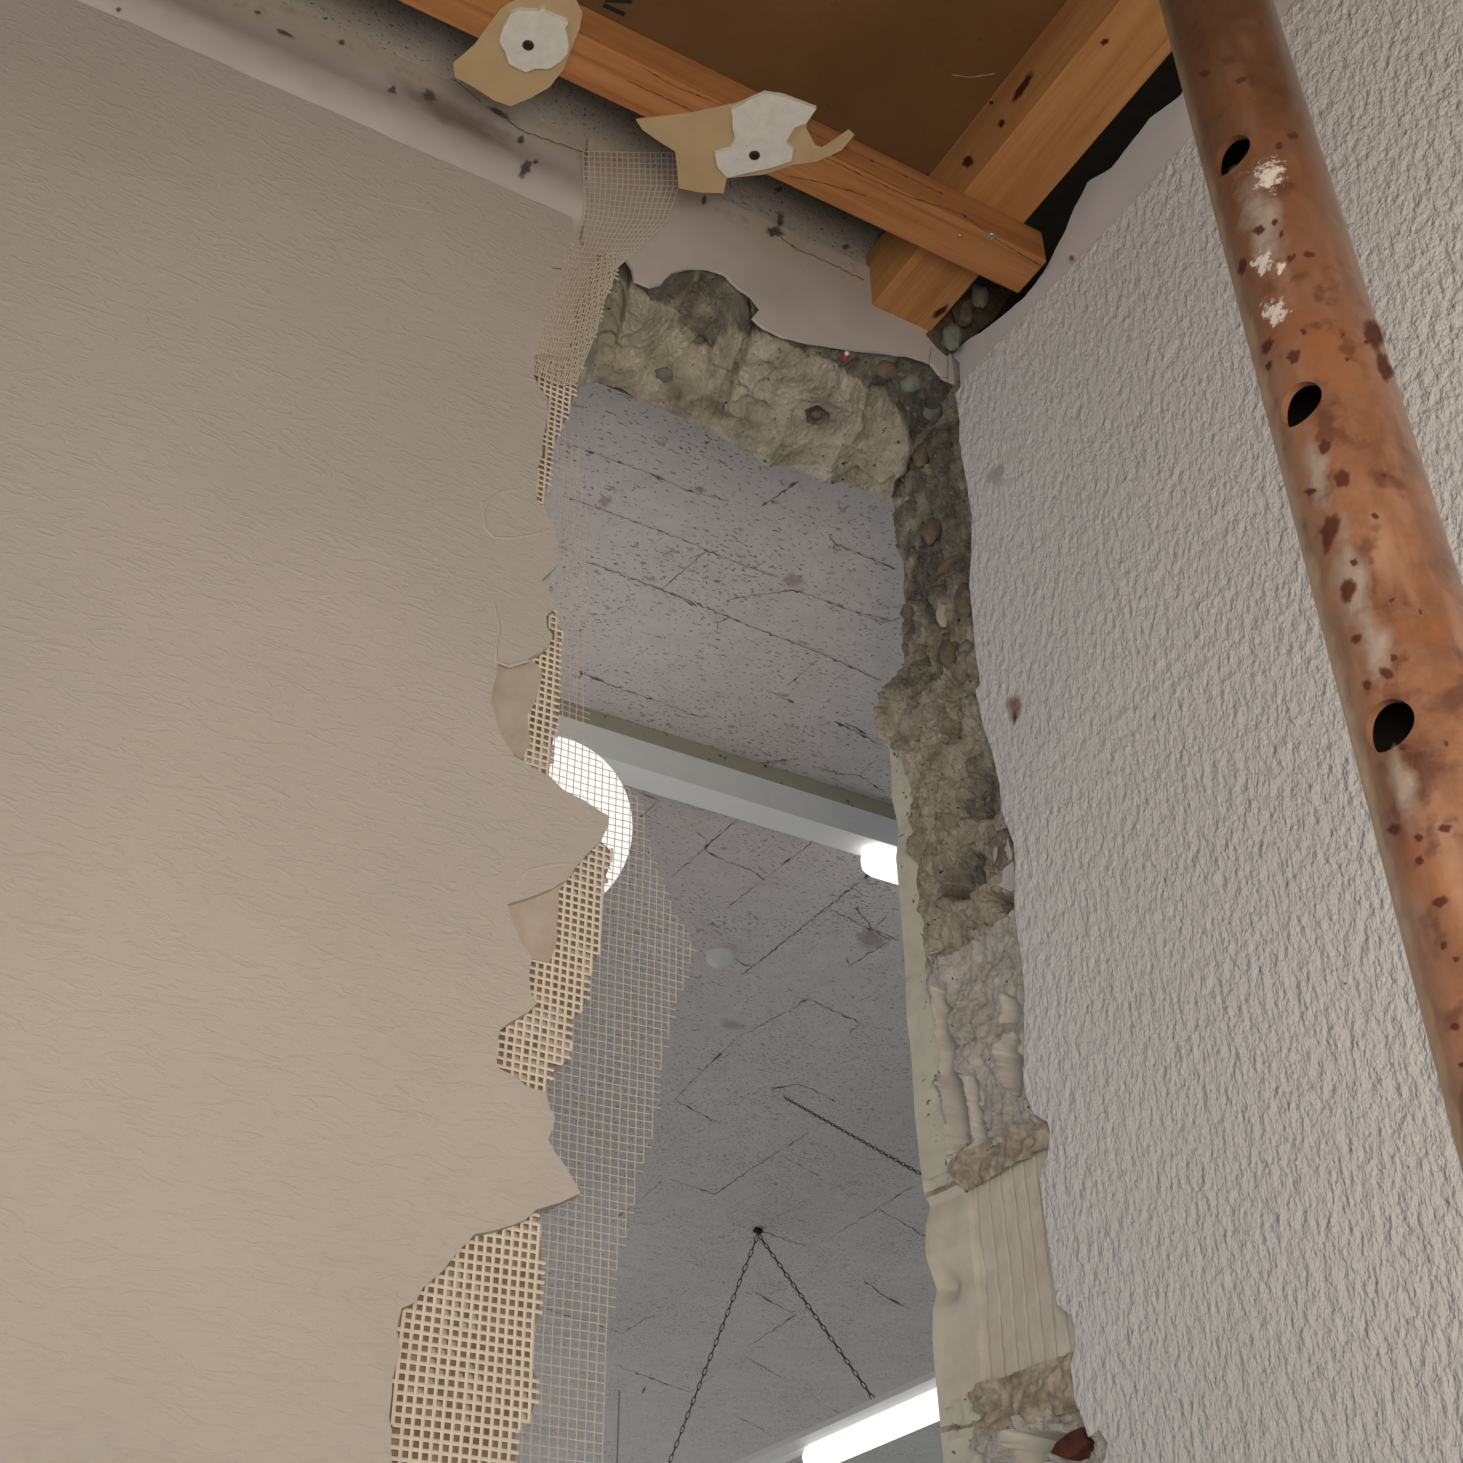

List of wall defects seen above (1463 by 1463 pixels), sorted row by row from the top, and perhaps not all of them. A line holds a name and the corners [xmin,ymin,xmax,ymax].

corrosion [1253,219,1284,237]
flaking render [532,237,620,505]
spalling [926,286,1012,356]
corrosion [1263,329,1307,370]
corrosion [1364,321,1393,380]
corrosion [1321,518,1339,550]
corrosion [1341,559,1357,602]
flaking render [491,609,564,775]
corrosion [1363,655,1397,690]
spalling [993,818,1015,892]
flaking render [496,842,613,1091]
flaking render [389,1213,546,1463]